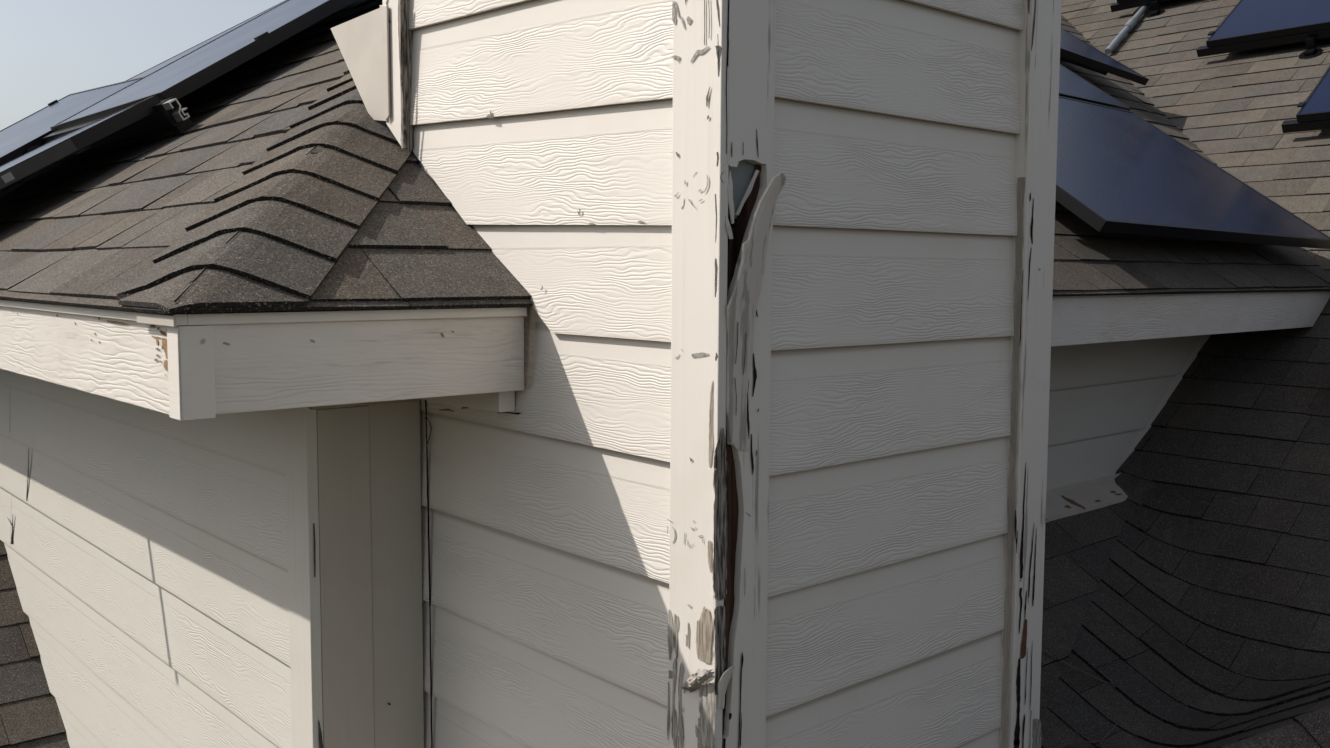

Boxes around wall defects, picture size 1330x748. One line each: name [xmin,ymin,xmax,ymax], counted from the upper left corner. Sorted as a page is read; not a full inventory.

spalling [672,1,692,29]
spalling [672,46,722,77]
spalling [668,431,739,748]